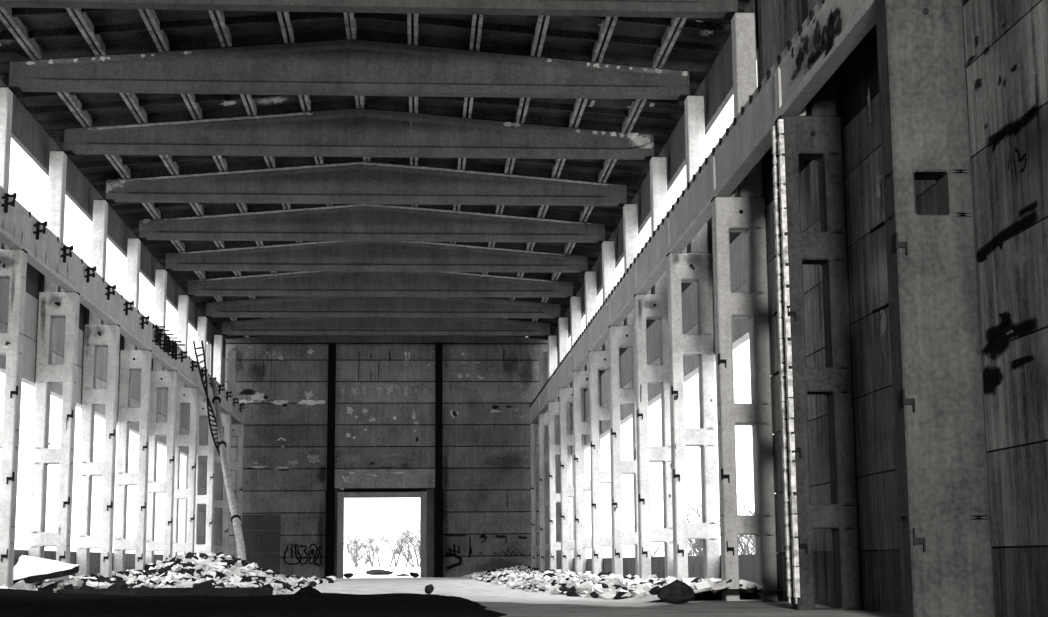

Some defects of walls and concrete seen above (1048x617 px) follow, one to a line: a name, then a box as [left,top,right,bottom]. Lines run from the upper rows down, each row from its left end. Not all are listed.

spalling [239,389,326,407]
peeling [345,406,376,439]